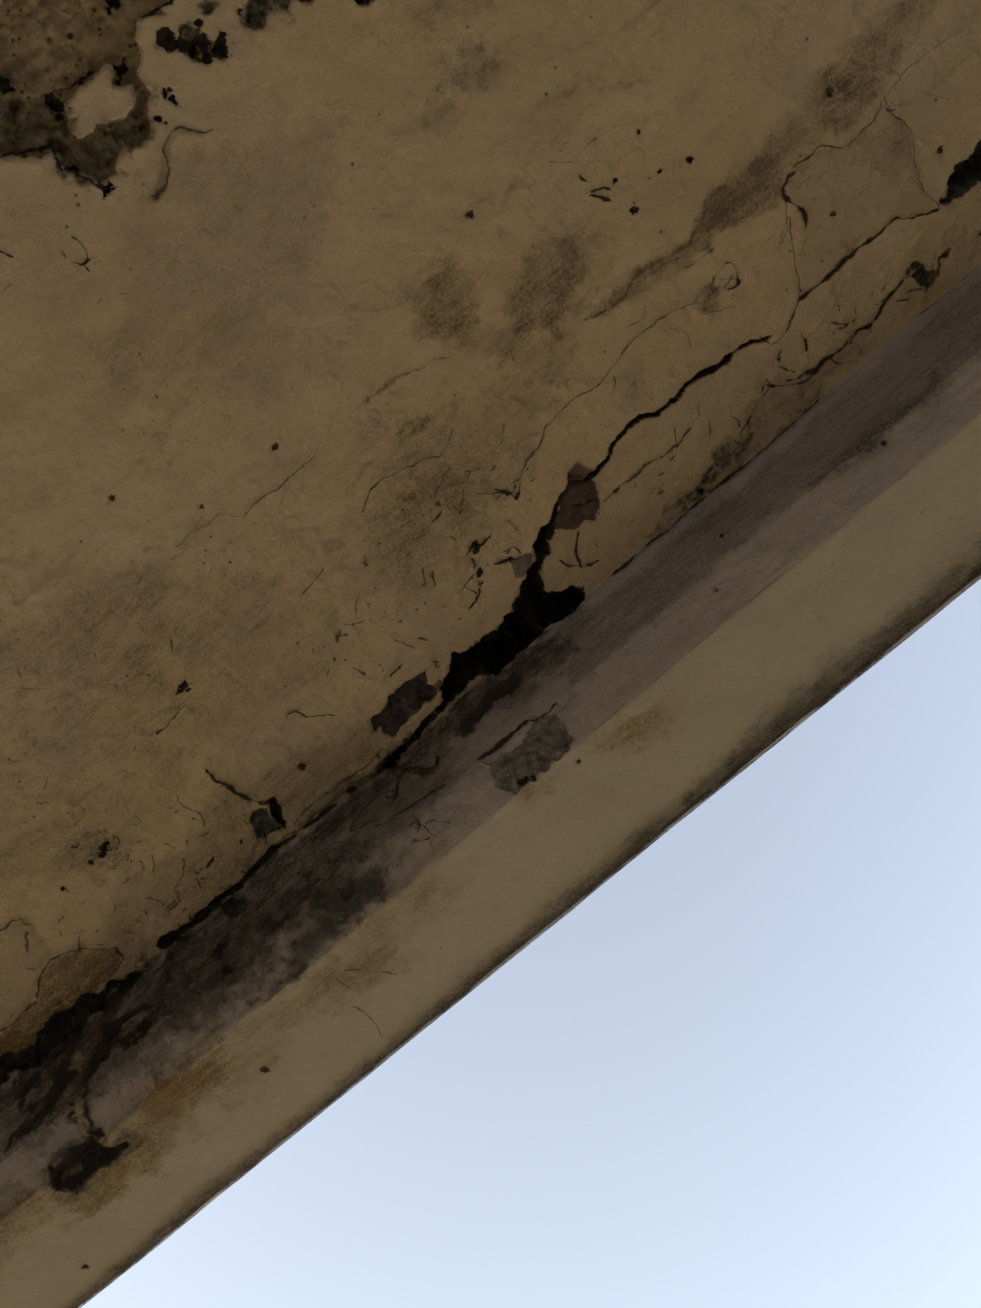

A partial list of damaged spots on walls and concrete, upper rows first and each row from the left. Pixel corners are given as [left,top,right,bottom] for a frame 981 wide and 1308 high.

flaking render [238,0,311,30]
flaking render [0,0,232,200]
spalling [939,140,981,203]
crack [61,235,129,303]
crack [313,99,977,679]
crack [176,455,315,547]
crack [134,639,193,749]
spalling [293,463,600,833]
crack [0,669,470,971]
leakage [0,281,981,1308]
spalling [48,1129,138,1194]